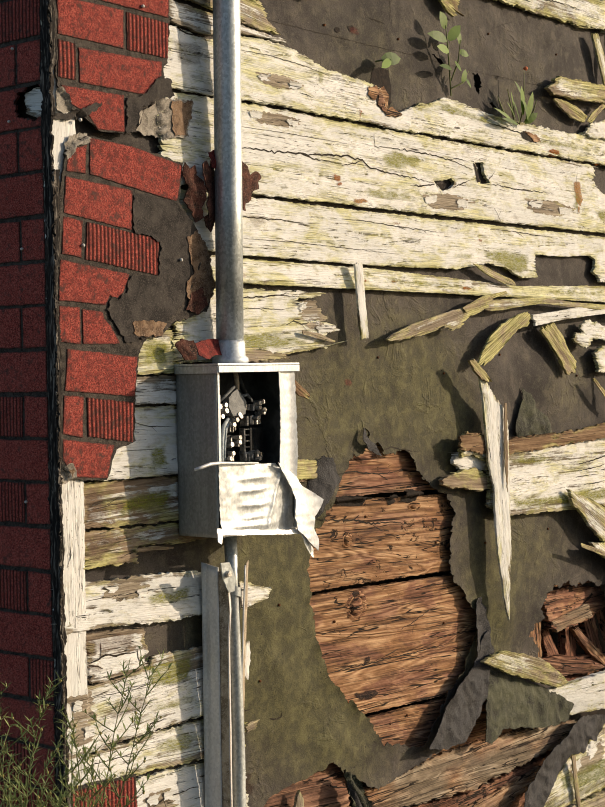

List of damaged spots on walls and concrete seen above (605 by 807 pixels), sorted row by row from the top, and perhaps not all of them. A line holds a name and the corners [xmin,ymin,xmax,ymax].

peeling [256,72,304,90]
spalling [368,85,402,117]
peeling [247,110,301,128]
crack [242,127,543,195]
crack [346,219,442,233]
crack [490,208,558,239]
peeling [295,300,336,333]
peeling [102,582,152,602]
peeling [143,788,179,807]